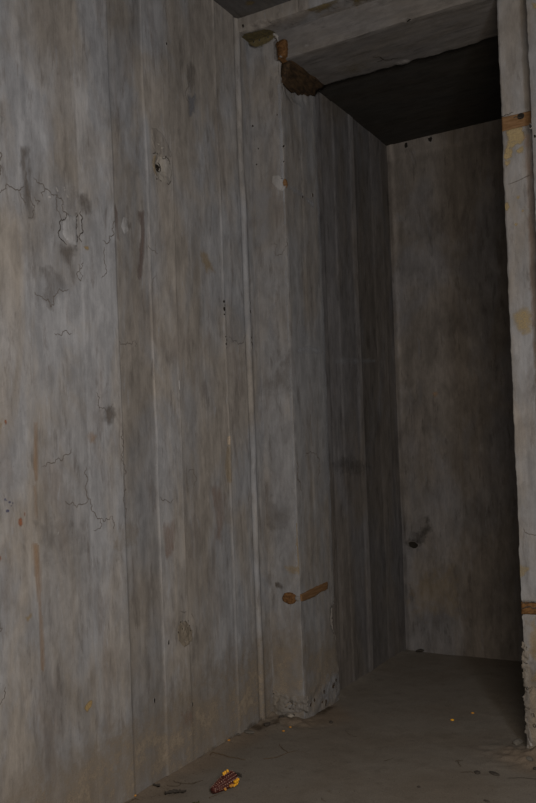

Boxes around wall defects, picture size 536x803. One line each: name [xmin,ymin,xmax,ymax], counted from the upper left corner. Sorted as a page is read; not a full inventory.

crack [0,172,76,219]
crack [65,432,127,531]
spalling [521,641,536,749]